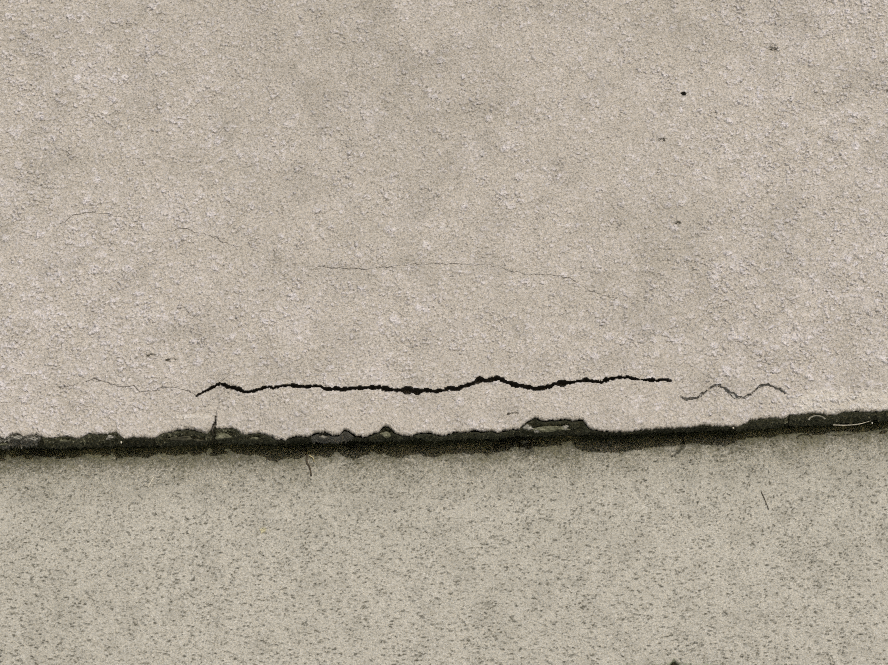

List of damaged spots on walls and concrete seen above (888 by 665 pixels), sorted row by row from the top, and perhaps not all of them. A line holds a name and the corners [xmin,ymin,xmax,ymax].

crack [58,376,783,435]